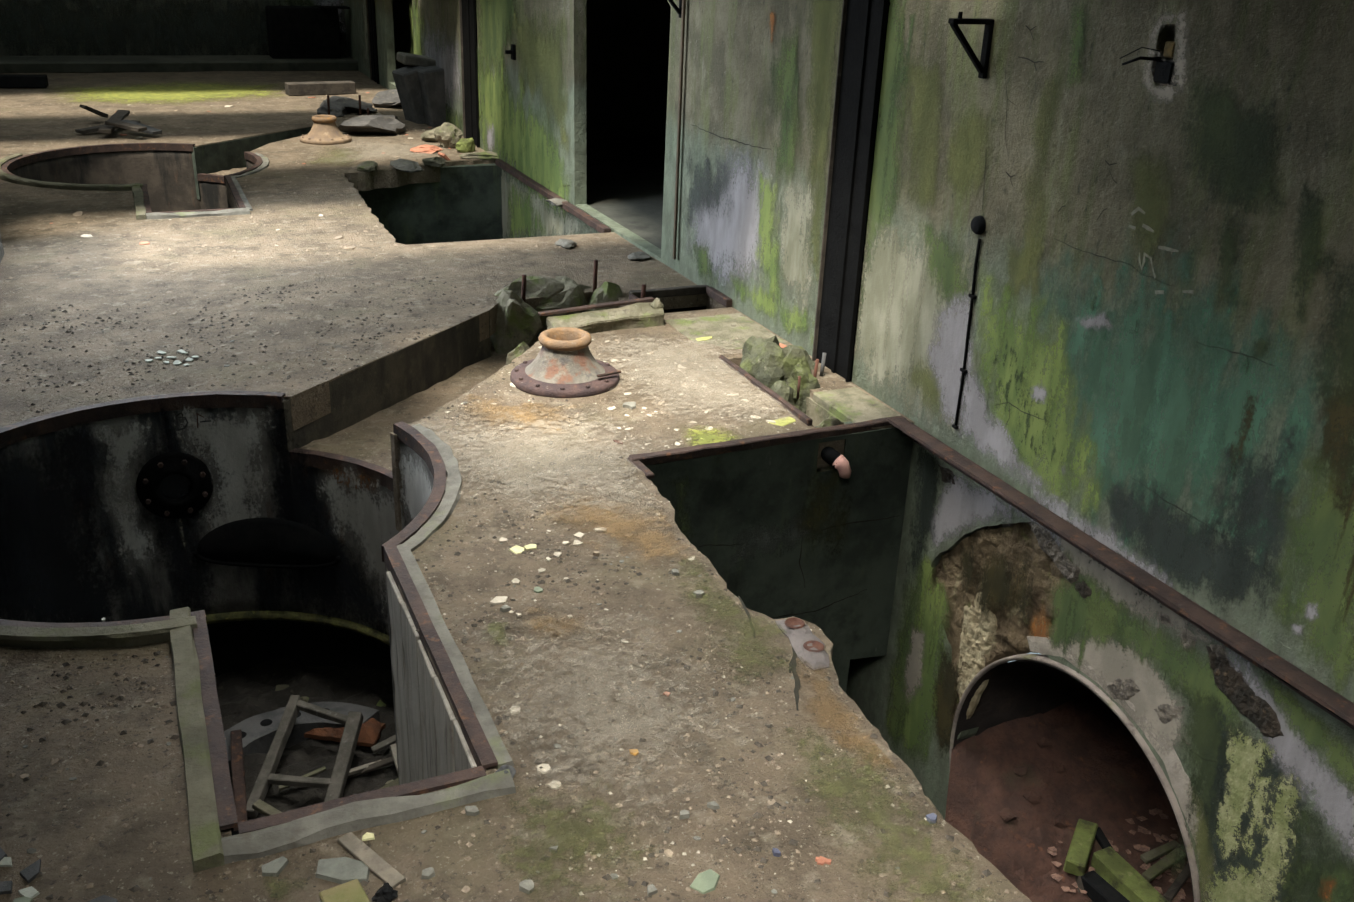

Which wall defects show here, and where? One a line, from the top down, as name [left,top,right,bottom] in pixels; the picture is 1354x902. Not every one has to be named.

damp [687,156,731,223]
damp [777,0,829,314]
damp [854,0,976,430]
damp [0,426,129,623]
damp [256,407,389,637]
spalling [646,397,915,693]
flaking render [903,626,925,698]
damp [909,446,998,753]
rust [961,545,1016,614]
rust [1030,616,1049,638]
flaking render [931,465,1354,858]
damp [1032,378,1354,618]